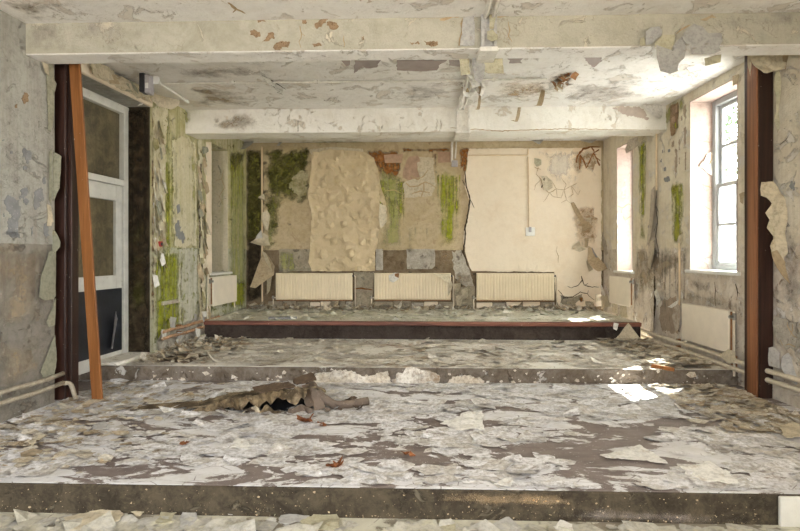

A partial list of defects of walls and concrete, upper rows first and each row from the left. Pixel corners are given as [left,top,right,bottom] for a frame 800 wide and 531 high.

peeling [342,60,381,73]
rust [547,71,579,92]
peeling [640,15,723,74]
rust [368,148,449,176]
crack [452,127,638,203]
peeling [3,152,62,378]
damp [128,108,182,352]
damp [231,150,309,302]
flaking render [250,194,640,341]
crack [461,171,474,266]
crack [558,276,595,303]
peeling [760,181,790,283]